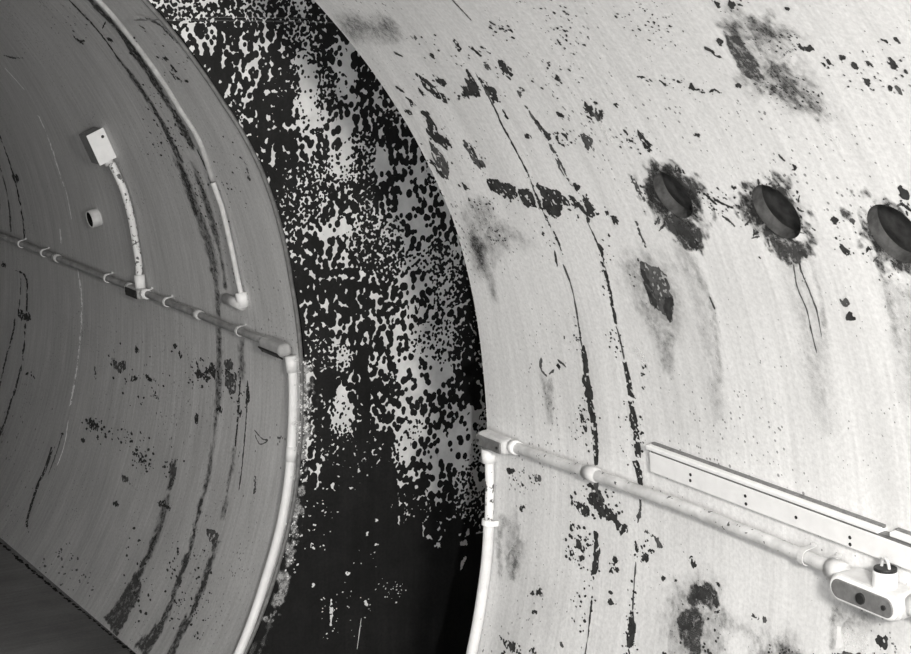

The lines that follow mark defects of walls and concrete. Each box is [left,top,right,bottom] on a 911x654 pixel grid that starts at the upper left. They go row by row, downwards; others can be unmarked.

peeling [415,39,513,119]
peeling [548,112,593,151]
peeling [583,101,604,123]
peeling [615,129,653,155]
damp [704,17,823,121]
corrosion [865,185,911,216]
peeling [139,0,487,570]
corrosion [629,160,822,353]
corrosion [840,298,856,321]
corrosion [830,209,911,281]
corrosion [670,580,721,654]
corrosion [874,635,897,654]